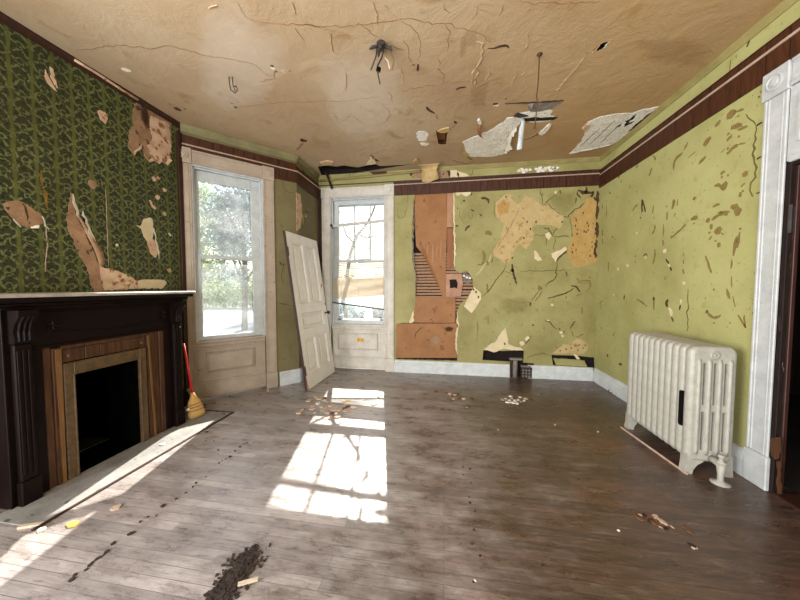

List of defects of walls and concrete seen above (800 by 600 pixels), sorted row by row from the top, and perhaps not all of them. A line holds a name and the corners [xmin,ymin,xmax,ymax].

crack [78,45,275,82]
crack [239,3,509,92]
spalling [320,155,387,175]
flaking render [463,117,521,157]
flaking render [569,106,659,154]
crack [746,114,758,197]
flaking render [100,266,171,291]
flaking render [412,205,442,297]
peeling [446,191,613,355]
crack [477,189,594,297]
peeling [552,328,588,360]